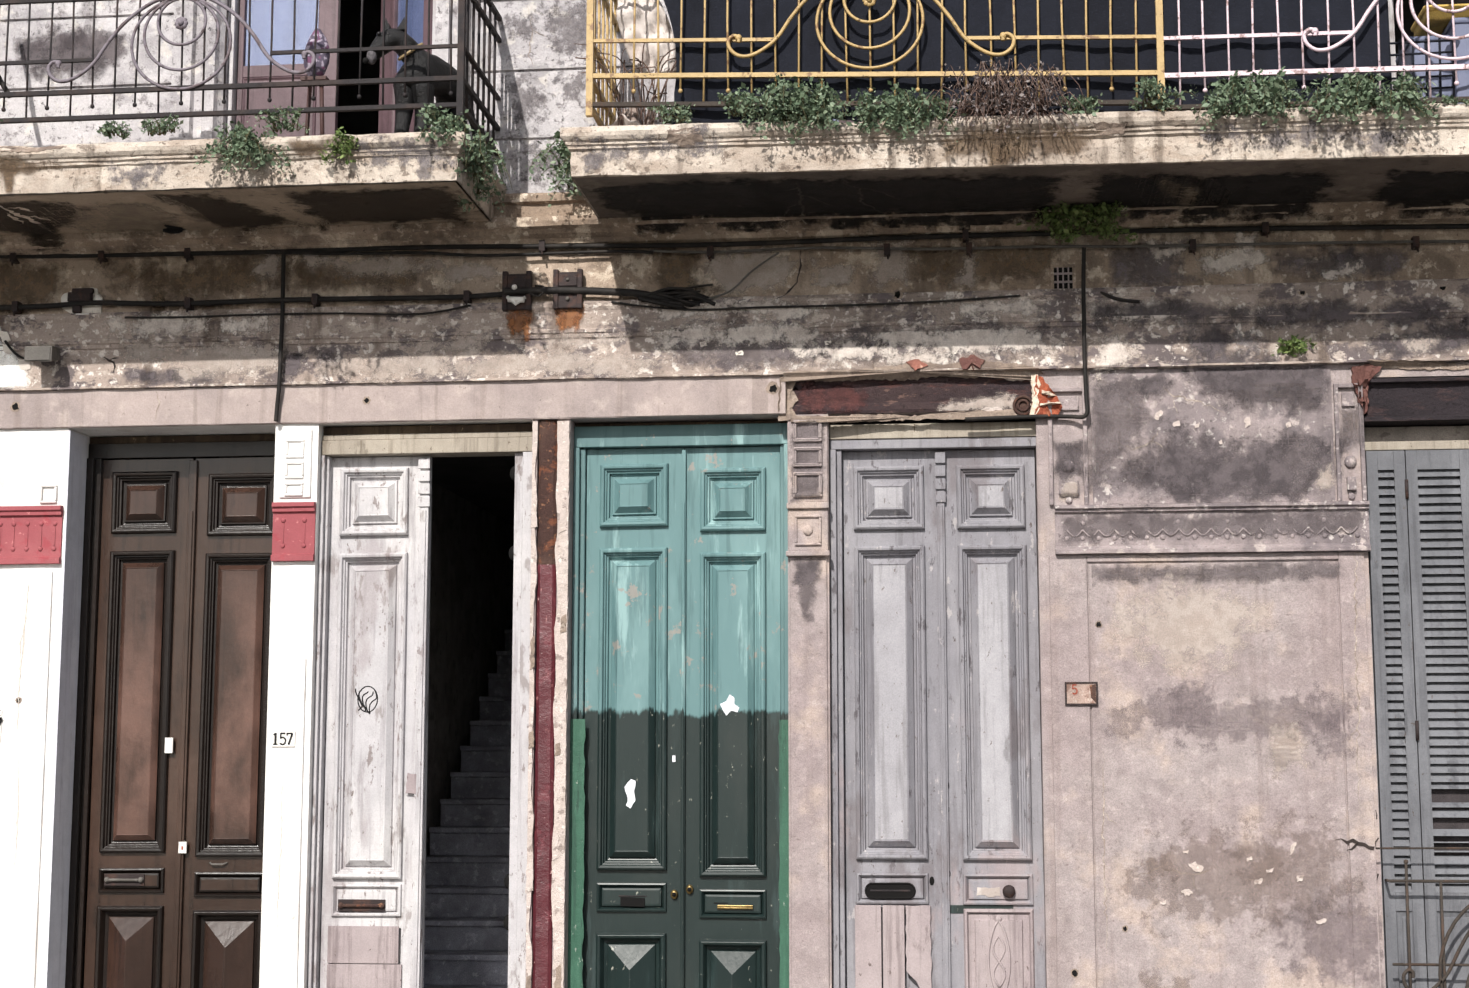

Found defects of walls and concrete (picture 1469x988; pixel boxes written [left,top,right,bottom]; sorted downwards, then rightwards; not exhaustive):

leakage [498,0,722,184]
leakage [0,136,466,315]
leakage [590,125,1088,292]
peeling [0,329,31,412]
peeling [105,311,278,381]
corrosion [506,310,532,341]
corrosion [555,305,585,330]
flaking render [302,240,1062,423]
leakage [671,316,1046,371]
leakage [1055,172,1469,543]
leakage [792,423,823,501]
leakage [793,559,820,621]